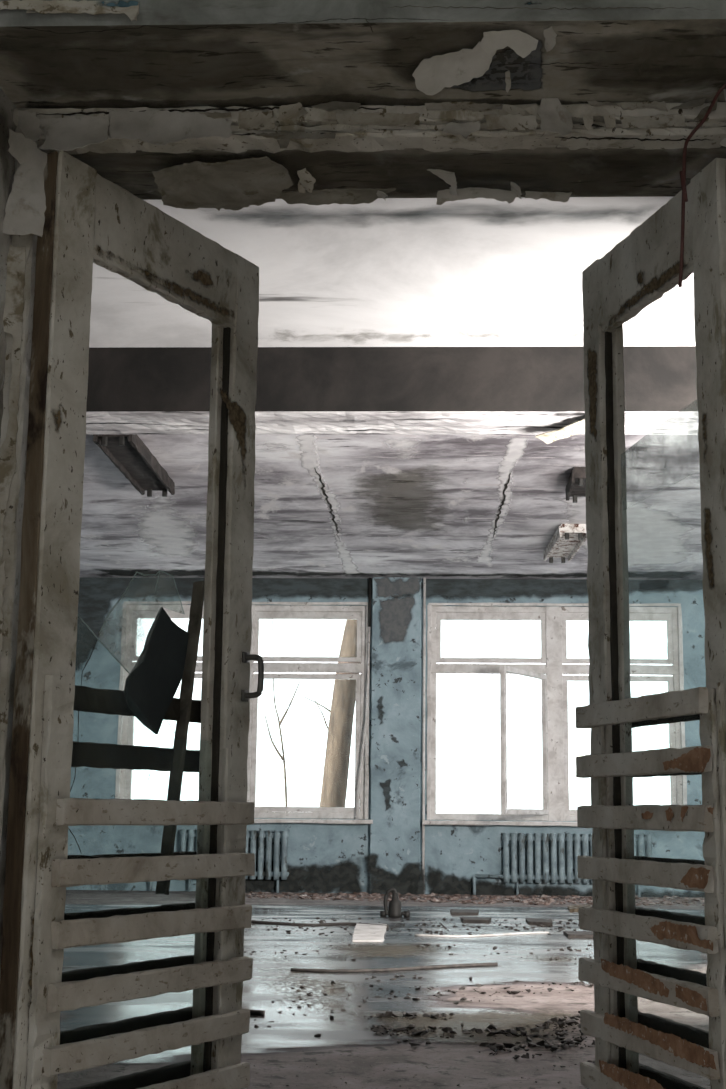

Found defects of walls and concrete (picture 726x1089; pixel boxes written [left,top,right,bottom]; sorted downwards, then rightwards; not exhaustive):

peeling [2,26,726,237]
crack [314,468,339,536]
leakage [363,470,439,531]
crack [493,473,511,537]
flaking render [374,577,420,643]